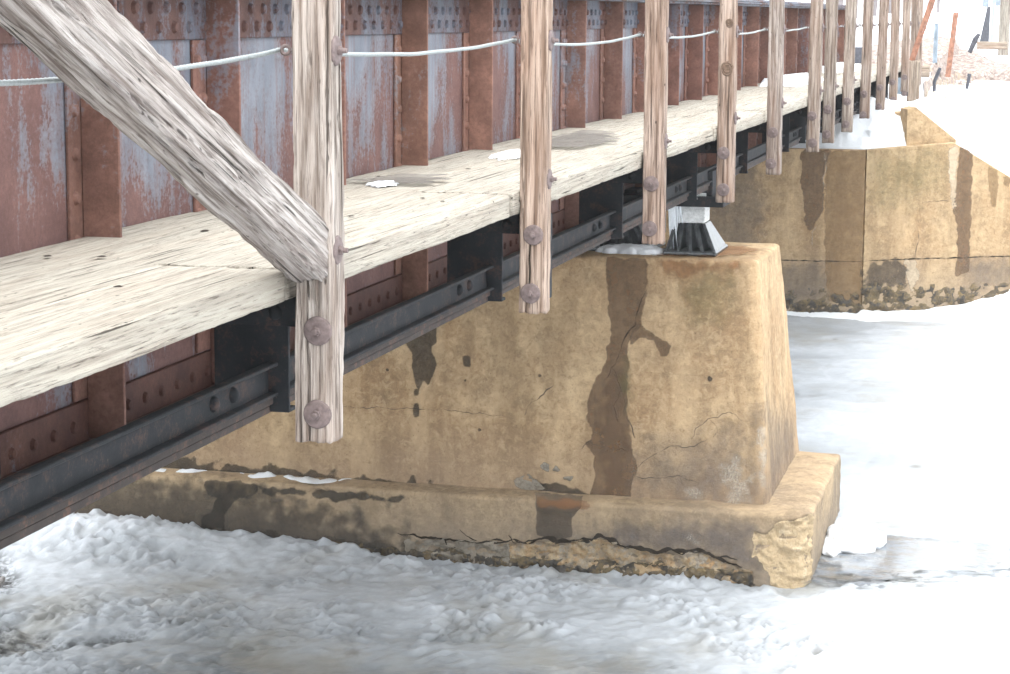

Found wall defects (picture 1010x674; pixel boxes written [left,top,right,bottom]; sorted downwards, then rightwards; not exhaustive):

rust [718,246,757,268]
water stain [800,149,919,301]
water stain [948,146,973,276]
water stain [406,328,437,417]
crack [582,290,742,483]
water stain [74,457,404,554]
spalling [358,514,815,589]